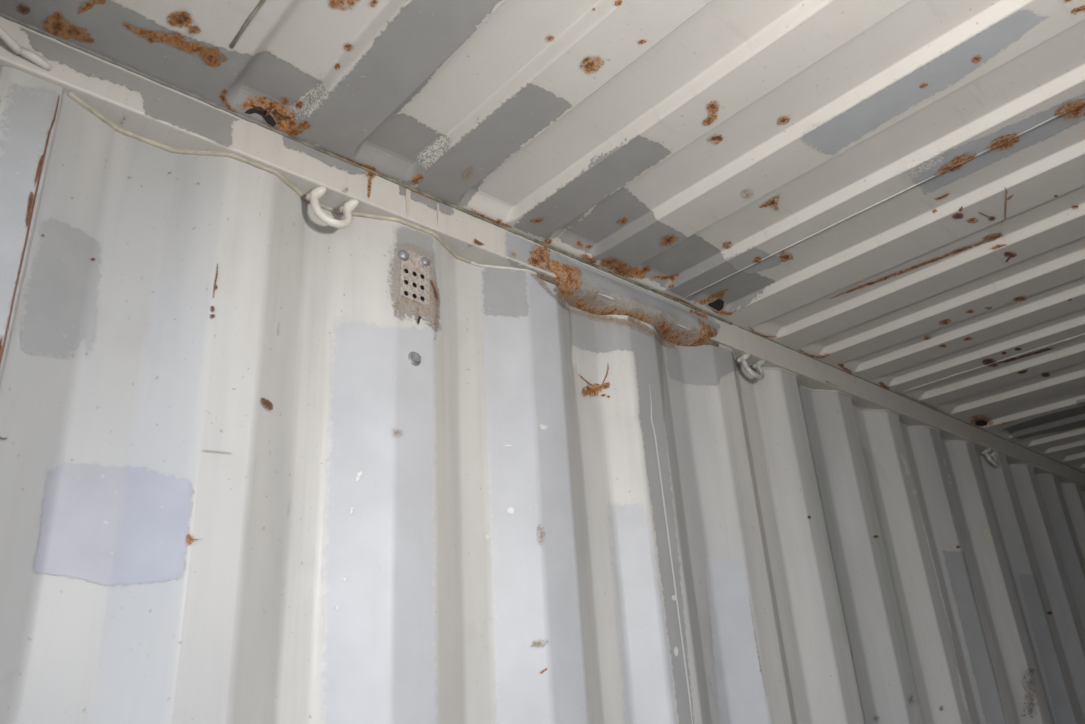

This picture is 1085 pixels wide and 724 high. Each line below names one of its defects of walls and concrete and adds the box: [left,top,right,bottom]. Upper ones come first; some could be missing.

rust [39,0,106,43]
rust [121,10,229,67]
rust [327,0,378,13]
rust [580,56,606,75]
rust [220,88,311,136]
rust [703,101,724,145]
rust [1053,98,1085,121]
rust [328,151,380,197]
rust [933,131,1022,176]
rust [829,206,1017,299]
rust [509,238,737,350]
rust [580,366,610,398]